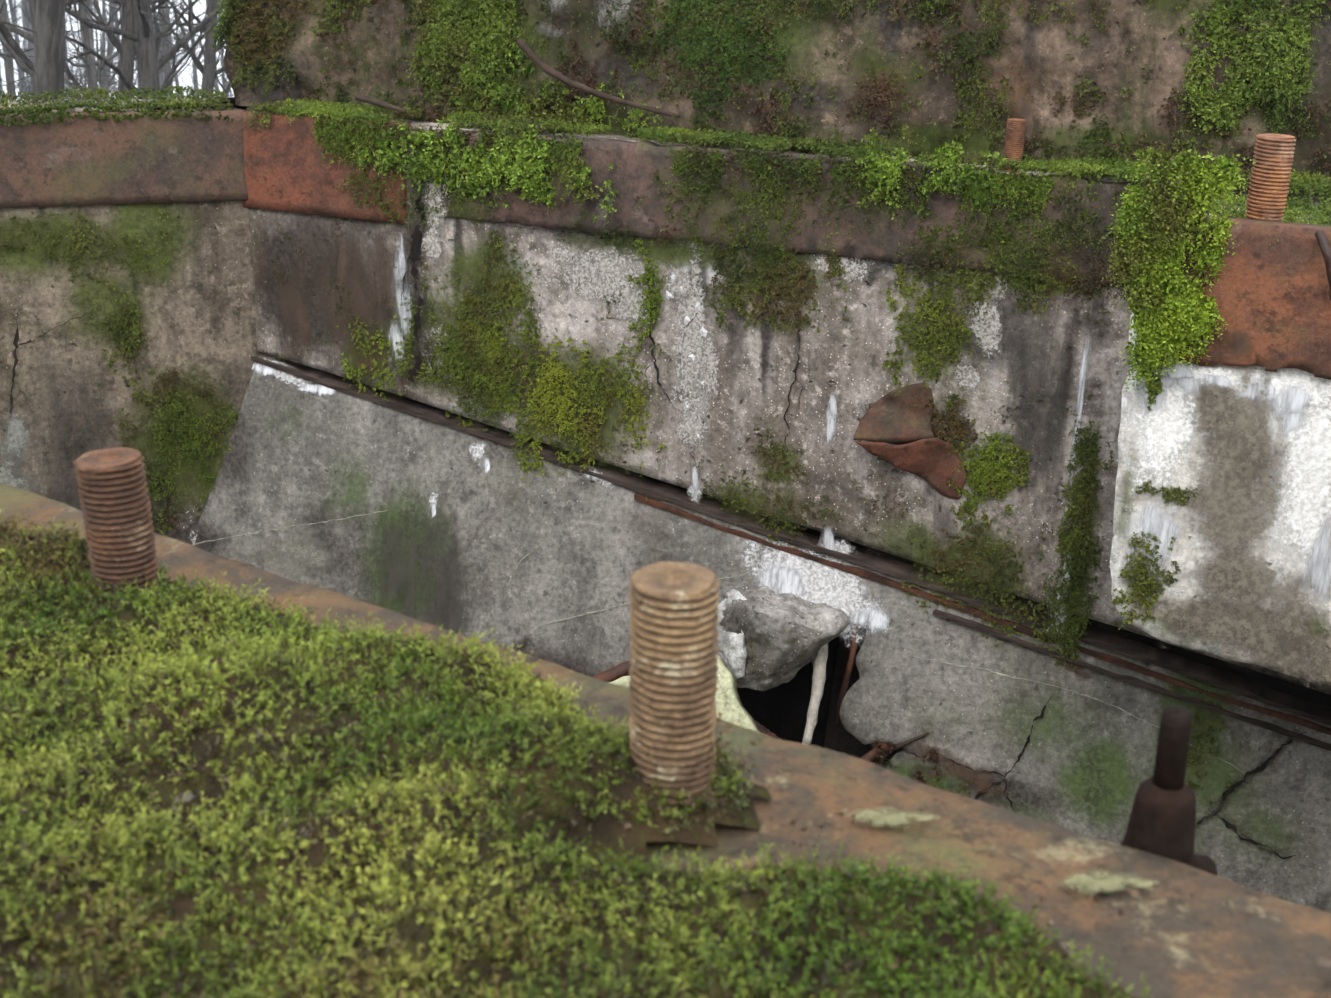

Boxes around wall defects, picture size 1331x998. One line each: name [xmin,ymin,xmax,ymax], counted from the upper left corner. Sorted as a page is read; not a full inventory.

crack [397,178,434,382]
crack [9,308,95,418]
leakage [1128,362,1331,682]
crack [904,654,1158,813]
crack [1190,732,1306,859]